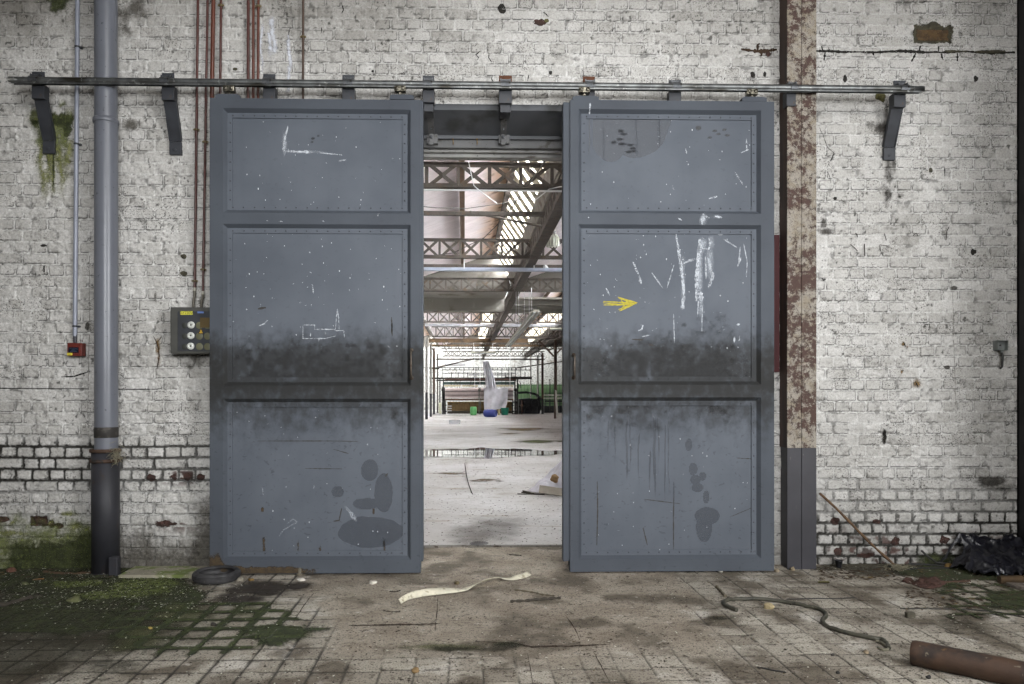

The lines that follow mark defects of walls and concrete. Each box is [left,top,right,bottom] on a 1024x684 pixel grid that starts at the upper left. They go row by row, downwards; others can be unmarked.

damp [38,141,74,191]